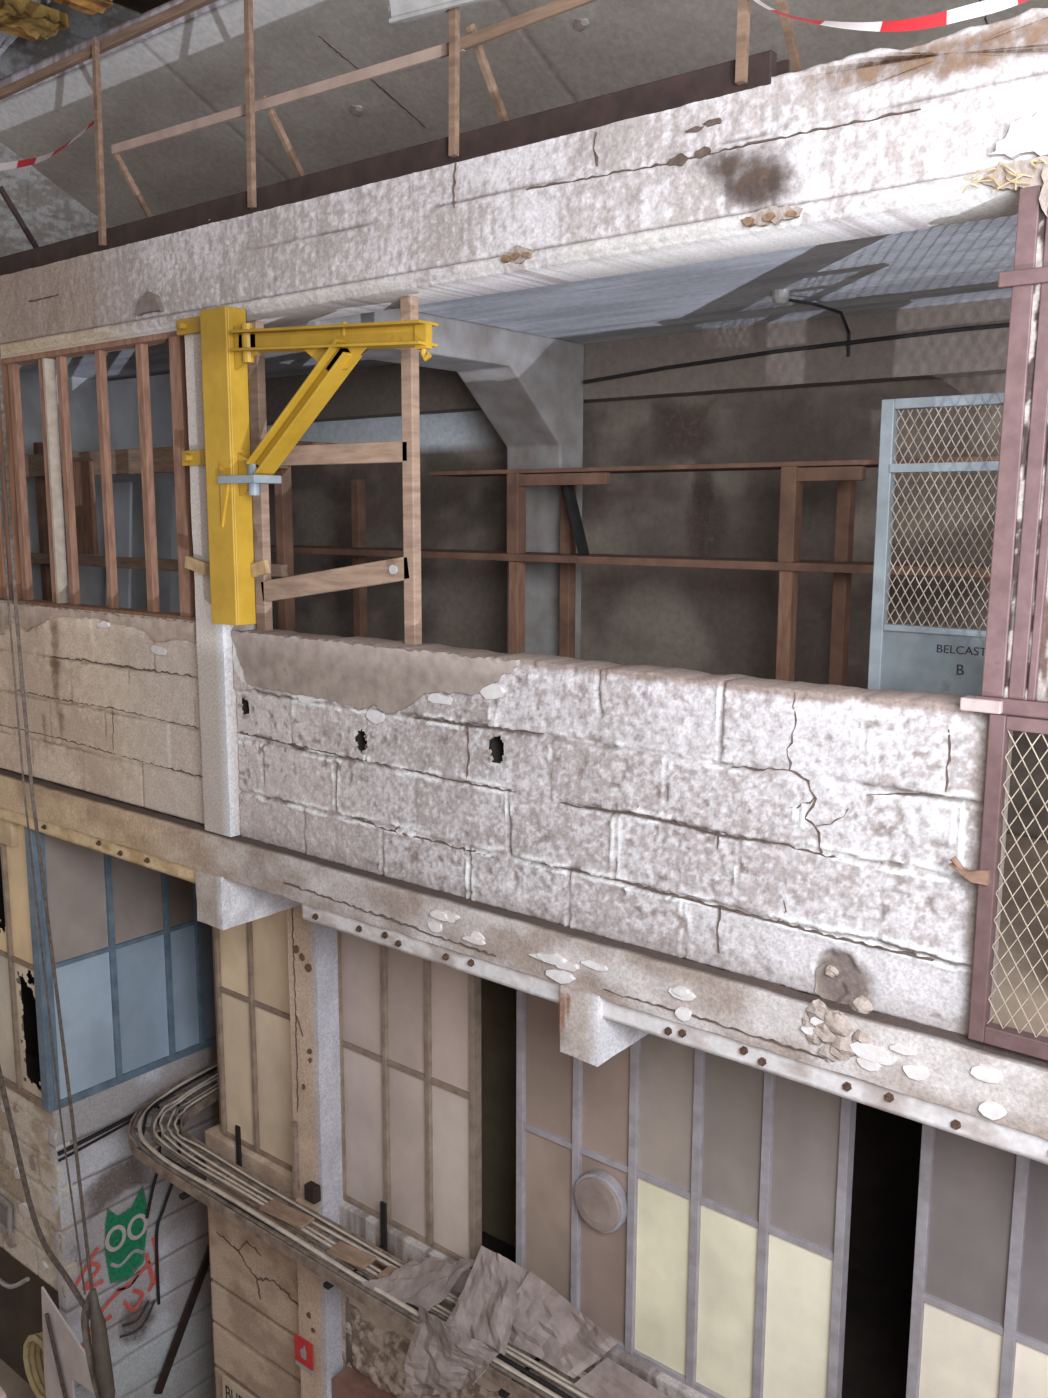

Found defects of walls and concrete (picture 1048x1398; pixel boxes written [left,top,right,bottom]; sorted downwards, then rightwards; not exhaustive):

crack [450,162,458,208]
crack [526,109,921,190]
leakage [711,149,790,203]
spalling [962,107,1048,702]
crack [560,693,951,860]
peeling [428,909,460,933]
peeling [463,931,486,945]
peeling [529,952,608,984]
peeling [668,985,696,1021]
spalling [801,956,930,1081]
peeling [978,1100,1007,1120]
crack [217,1232,298,1306]